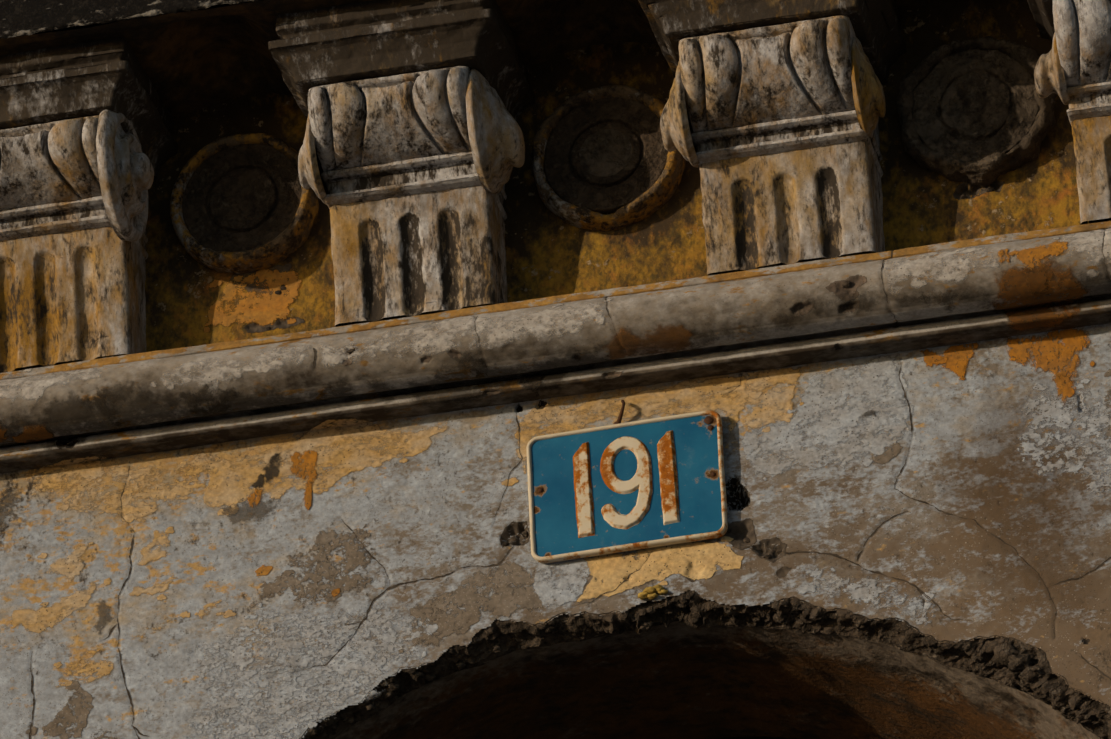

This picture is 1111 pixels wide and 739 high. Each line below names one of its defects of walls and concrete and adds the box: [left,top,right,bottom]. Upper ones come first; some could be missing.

peeling [25,418,449,565]
peeling [203,263,305,333]
damp [0,347,610,448]
peeling [151,298,613,390]
crack [493,414,522,525]
peeling [501,355,914,486]
crack [745,358,1111,638]
peeling [11,542,112,633]
crack [103,466,147,739]
crack [272,520,520,676]
spalling [129,478,1111,739]
crack [28,651,36,739]